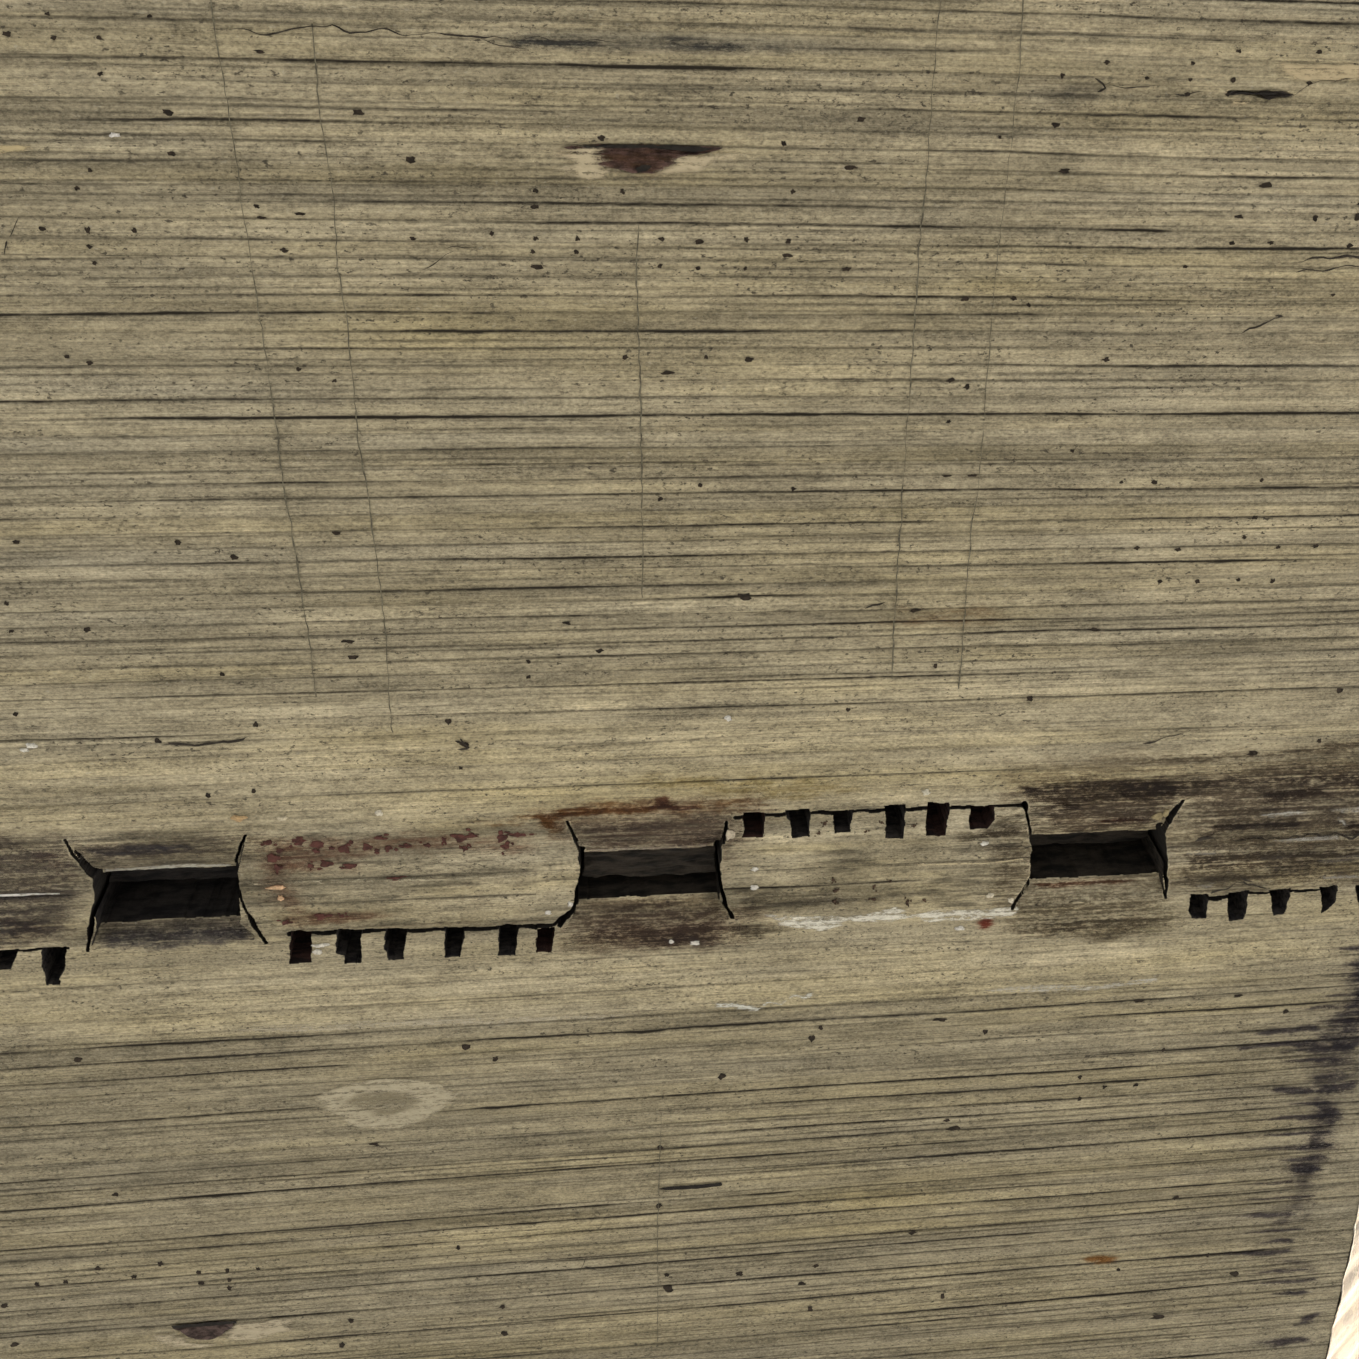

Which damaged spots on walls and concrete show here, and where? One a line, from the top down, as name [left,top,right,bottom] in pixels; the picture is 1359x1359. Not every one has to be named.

spalling [74,815,248,946]
damp [105,864,230,872]
corrosion [260,798,694,875]
spalling [568,823,735,919]
damp [765,907,1017,931]
spalling [986,801,1174,907]
damp [1261,808,1359,860]
damp [1243,994,1359,1255]